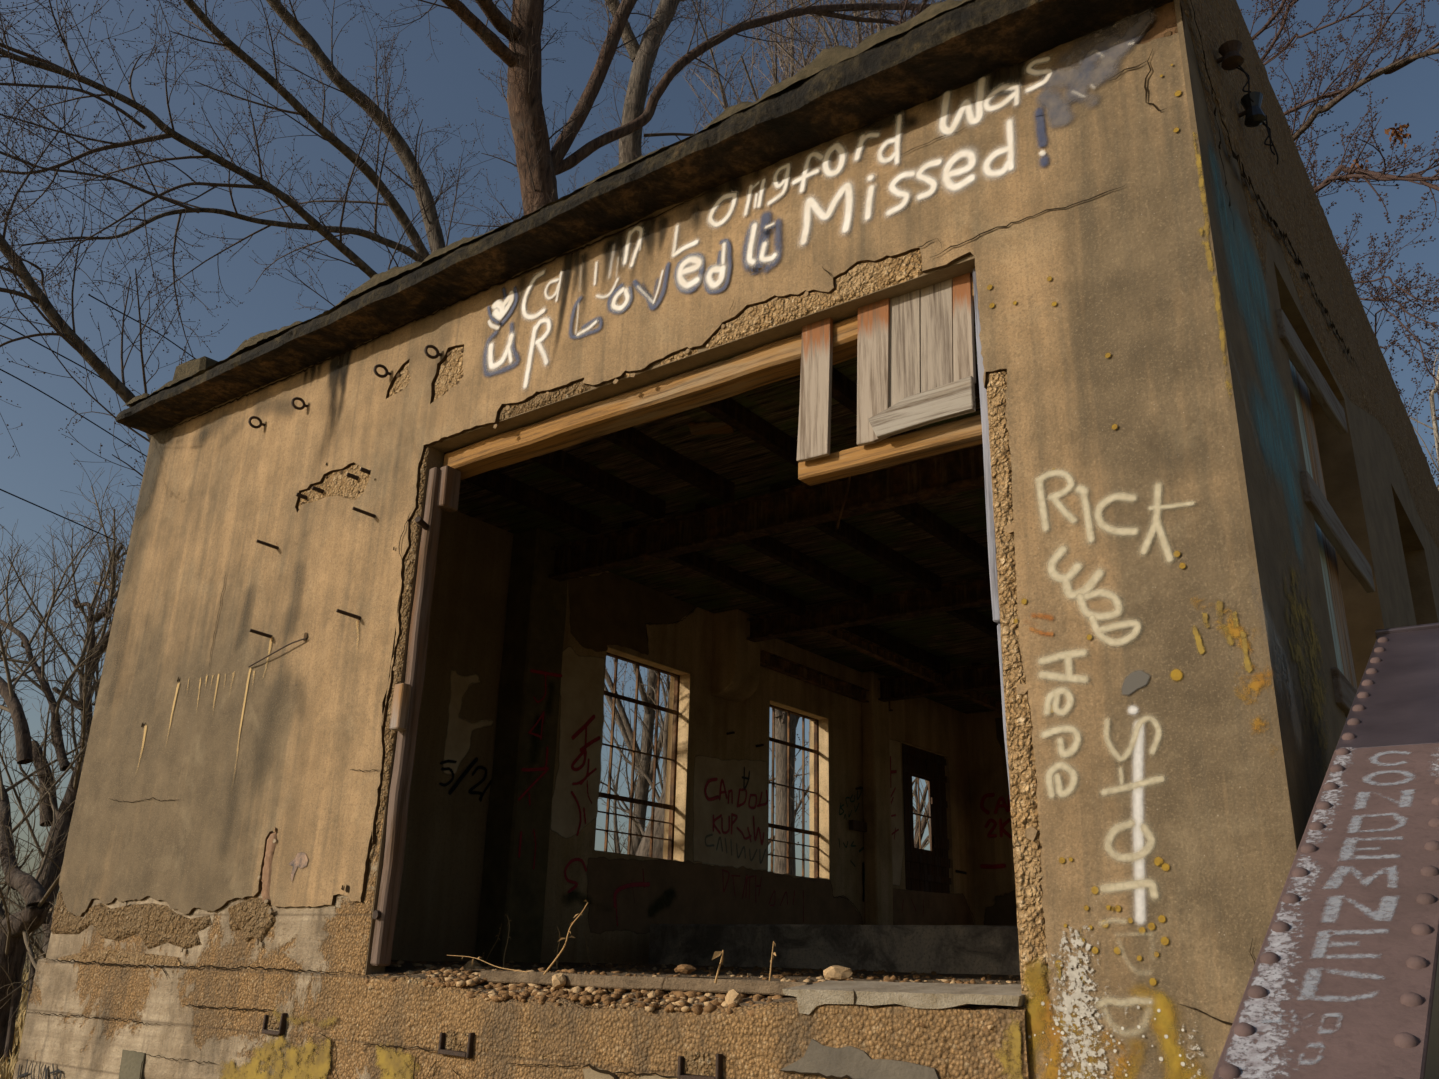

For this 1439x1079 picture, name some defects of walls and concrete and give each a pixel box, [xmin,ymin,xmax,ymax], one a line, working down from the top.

crack [1107,49,1166,111]
crack [918,186,1123,258]
crack [1190,0,1359,370]
damp [304,348,351,408]
spalling [295,462,371,512]
spalling [360,247,972,903]
spalling [46,827,340,966]
peeling [587,756,865,934]